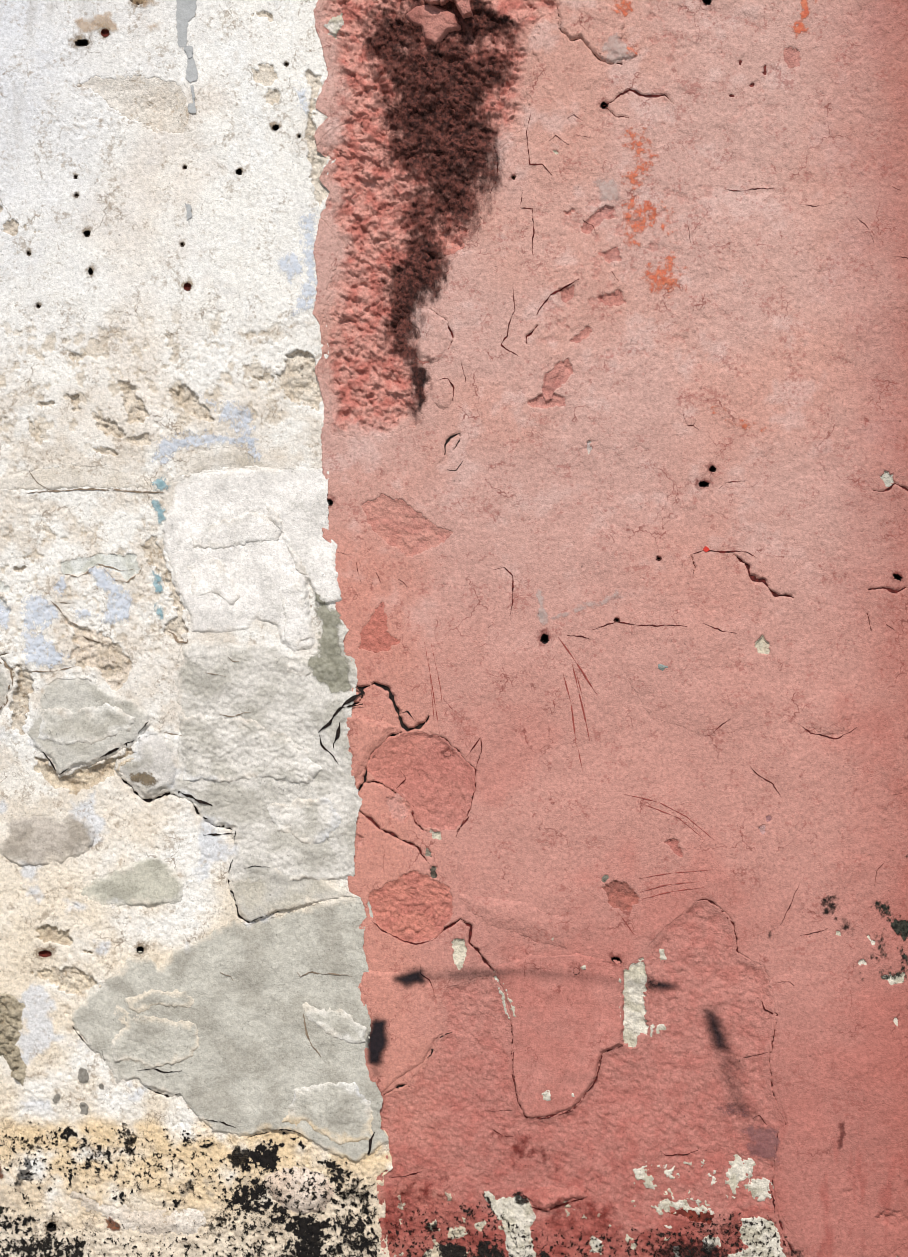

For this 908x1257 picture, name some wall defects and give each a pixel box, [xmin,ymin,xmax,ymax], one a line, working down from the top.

crack [490,7,669,253]
leakage [365,0,517,416]
spalling [0,380,261,735]
crack [691,550,793,598]
spalling [34,747,134,795]
crack [318,682,482,861]
leakage [78,1068,104,1089]
peeling [111,989,200,1068]
spalling [282,731,794,1257]
crack [494,1024,623,1137]
crack [700,899,747,960]
leakage [0,1102,803,1257]